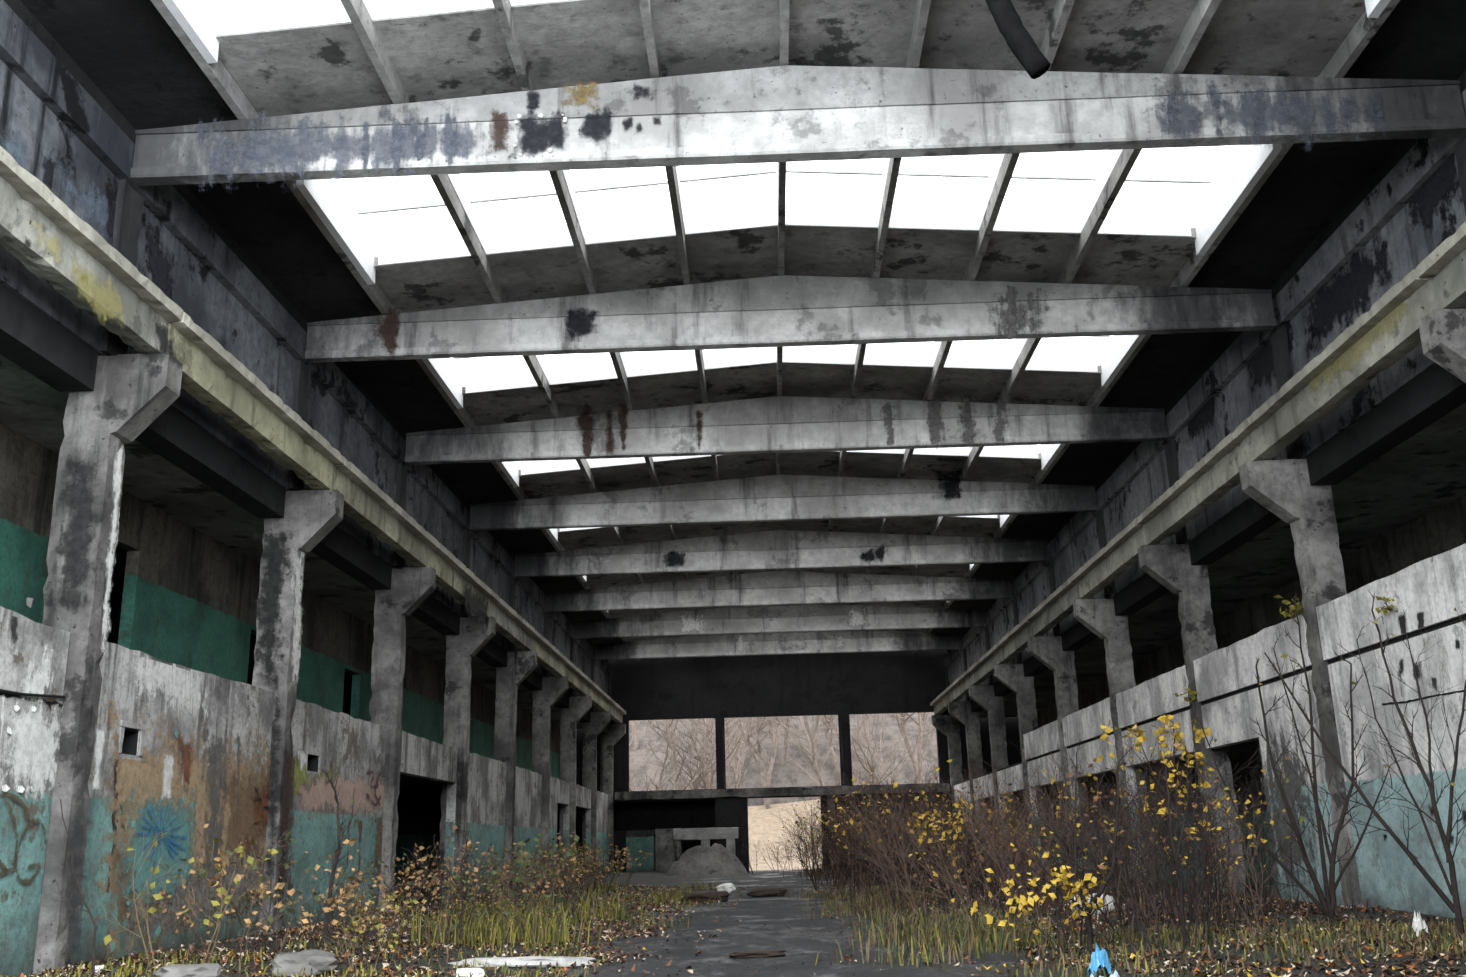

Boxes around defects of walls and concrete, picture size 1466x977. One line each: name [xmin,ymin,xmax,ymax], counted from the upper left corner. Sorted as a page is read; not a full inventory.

damp [195,108,661,180]
damp [0,644,63,799]
damp [85,628,94,708]
damp [63,726,92,954]
peeling [97,699,271,959]